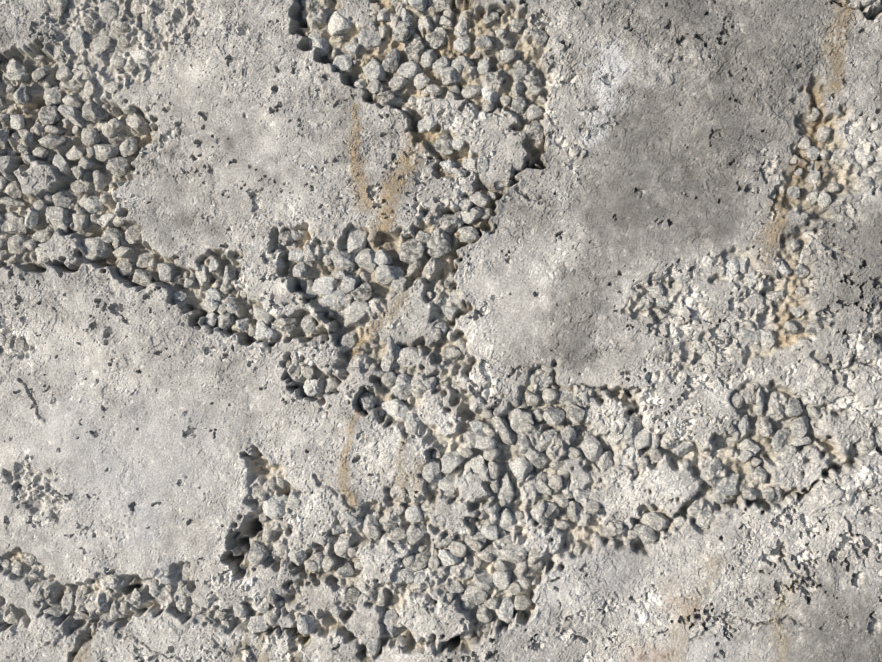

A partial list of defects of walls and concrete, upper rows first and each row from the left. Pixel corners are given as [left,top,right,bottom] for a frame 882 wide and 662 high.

peeling [323,0,383,43]
peeling [0,151,65,206]
peeling [38,222,87,277]
peeling [332,367,386,398]
peeling [408,347,472,439]
peeling [582,390,634,437]
peeling [762,410,879,495]
peeling [426,467,518,542]
peeling [564,454,704,530]
peeling [512,513,564,565]
peeling [234,533,411,645]
peeling [397,590,474,653]